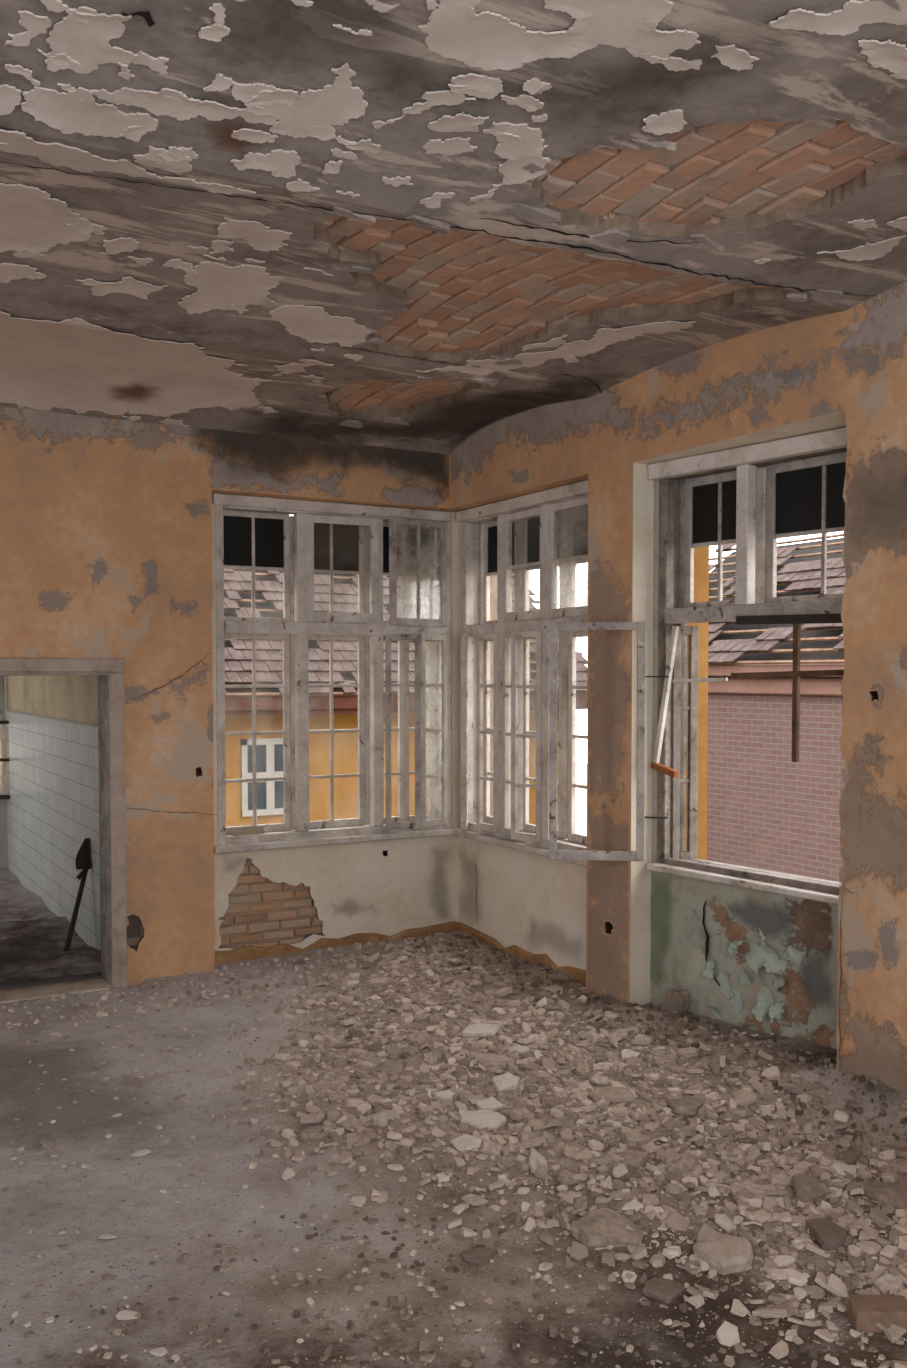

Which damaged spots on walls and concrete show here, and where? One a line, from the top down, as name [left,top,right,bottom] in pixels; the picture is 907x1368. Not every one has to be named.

flaking render [0,0,907,518]
peeling [844,437,907,578]
peeling [129,559,197,617]
flaking render [231,826,264,836]
peeling [839,733,907,896]
flaking render [219,858,323,949]
peeling [703,897,907,1094]